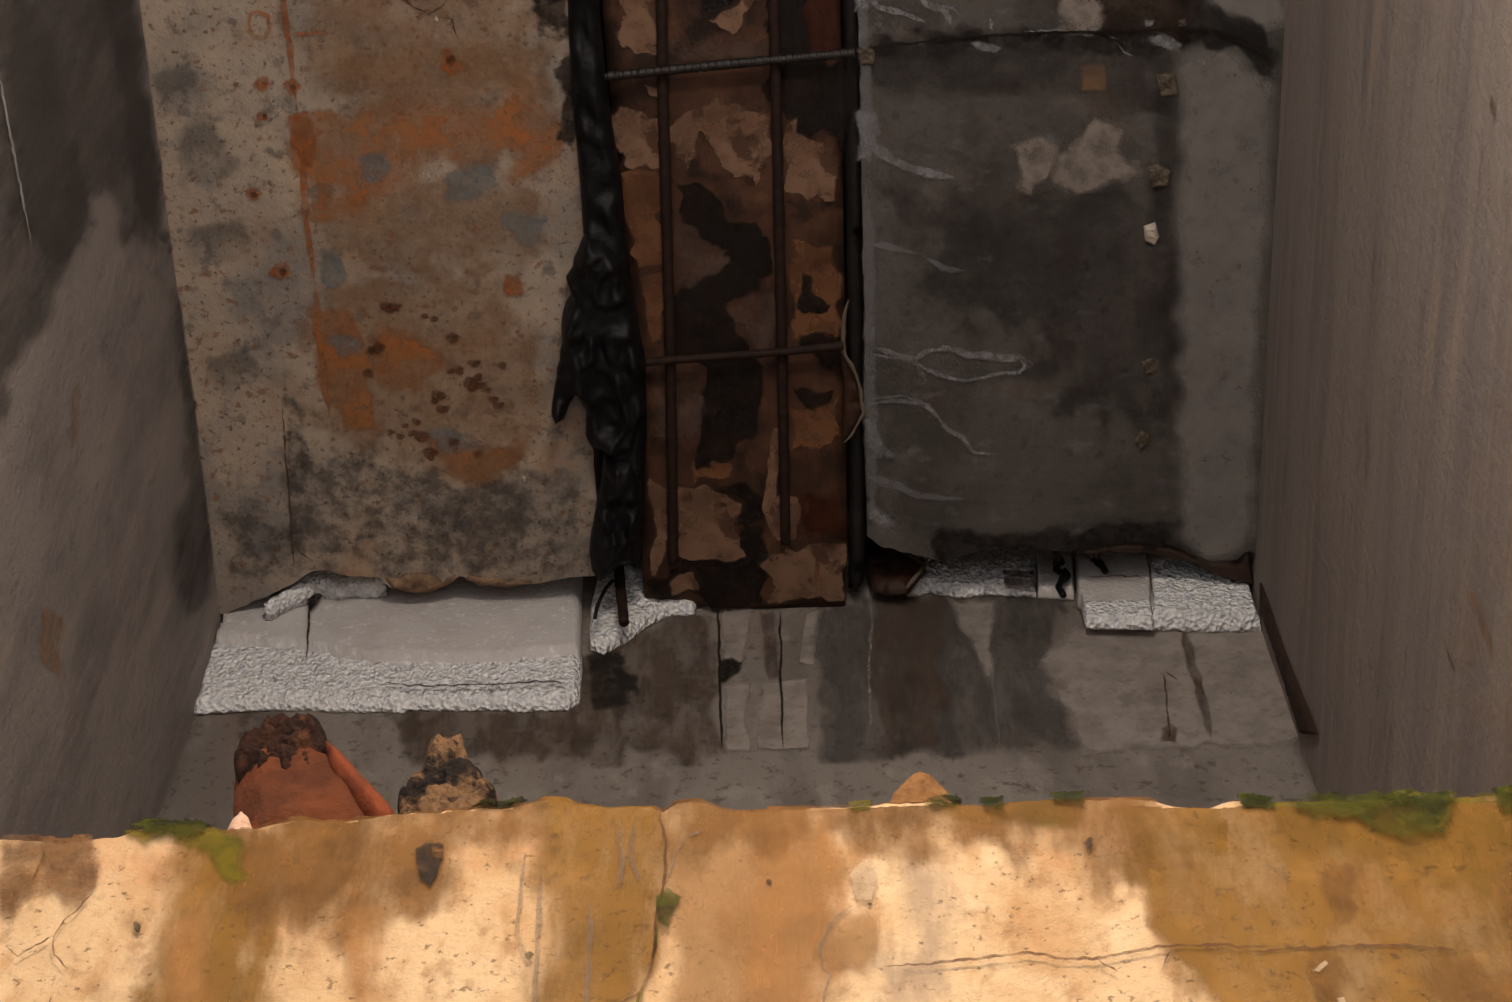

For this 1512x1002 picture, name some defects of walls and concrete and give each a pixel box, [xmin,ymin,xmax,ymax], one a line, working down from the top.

peeling [618,0,657,55]
crack [870,20,1269,61]
peeling [611,100,843,349]
corrosion [431,392,449,413]
corrosion [449,361,506,409]
corrosion [387,420,482,460]
mould [231,431,579,584]
peeling [647,398,847,605]
water stain [466,482,1064,764]
water stain [397,711,456,764]
water stain [136,796,1512,1002]
crack [892,943,1455,971]